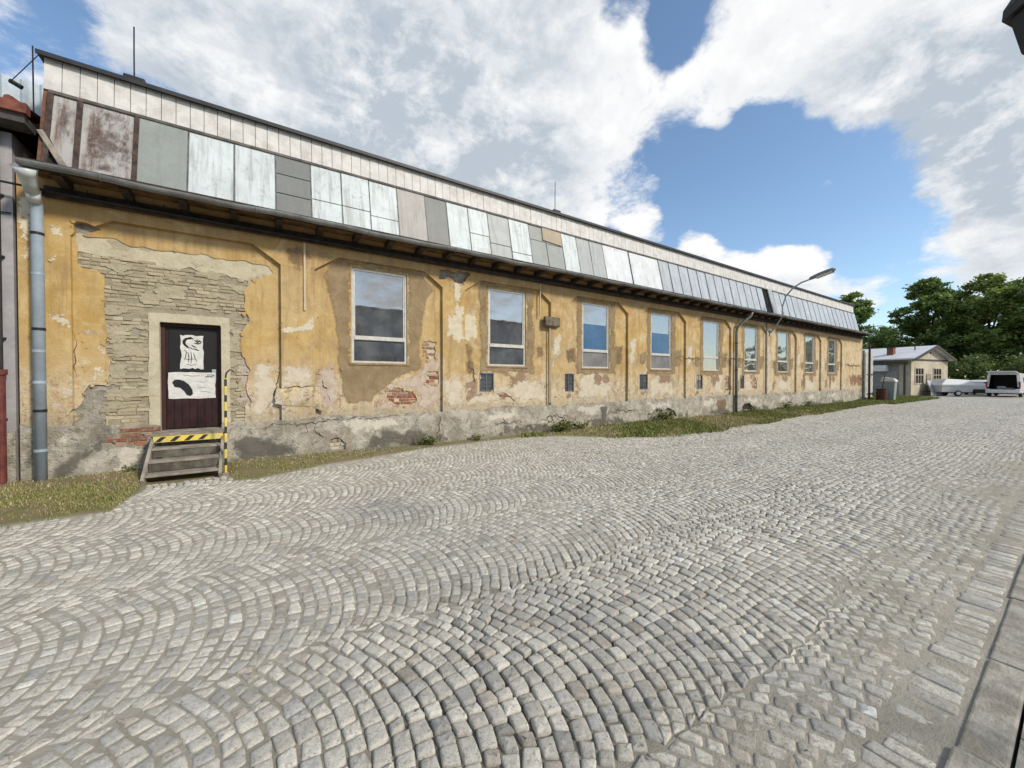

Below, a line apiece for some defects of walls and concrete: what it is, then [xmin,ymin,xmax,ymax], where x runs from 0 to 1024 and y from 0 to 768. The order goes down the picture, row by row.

rust [88,110,132,170]
flaking render [49,219,545,471]
crack [256,367,400,437]